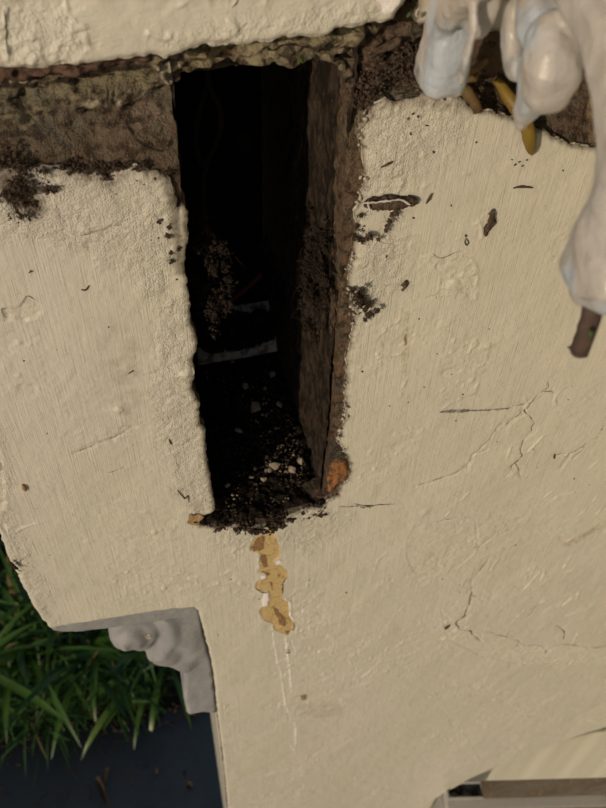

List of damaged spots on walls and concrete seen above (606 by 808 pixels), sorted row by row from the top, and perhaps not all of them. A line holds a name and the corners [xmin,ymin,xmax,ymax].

spalling [473,69,517,106]
spalling [533,69,596,145]
spalling [0,0,424,635]
crack [420,384,553,485]